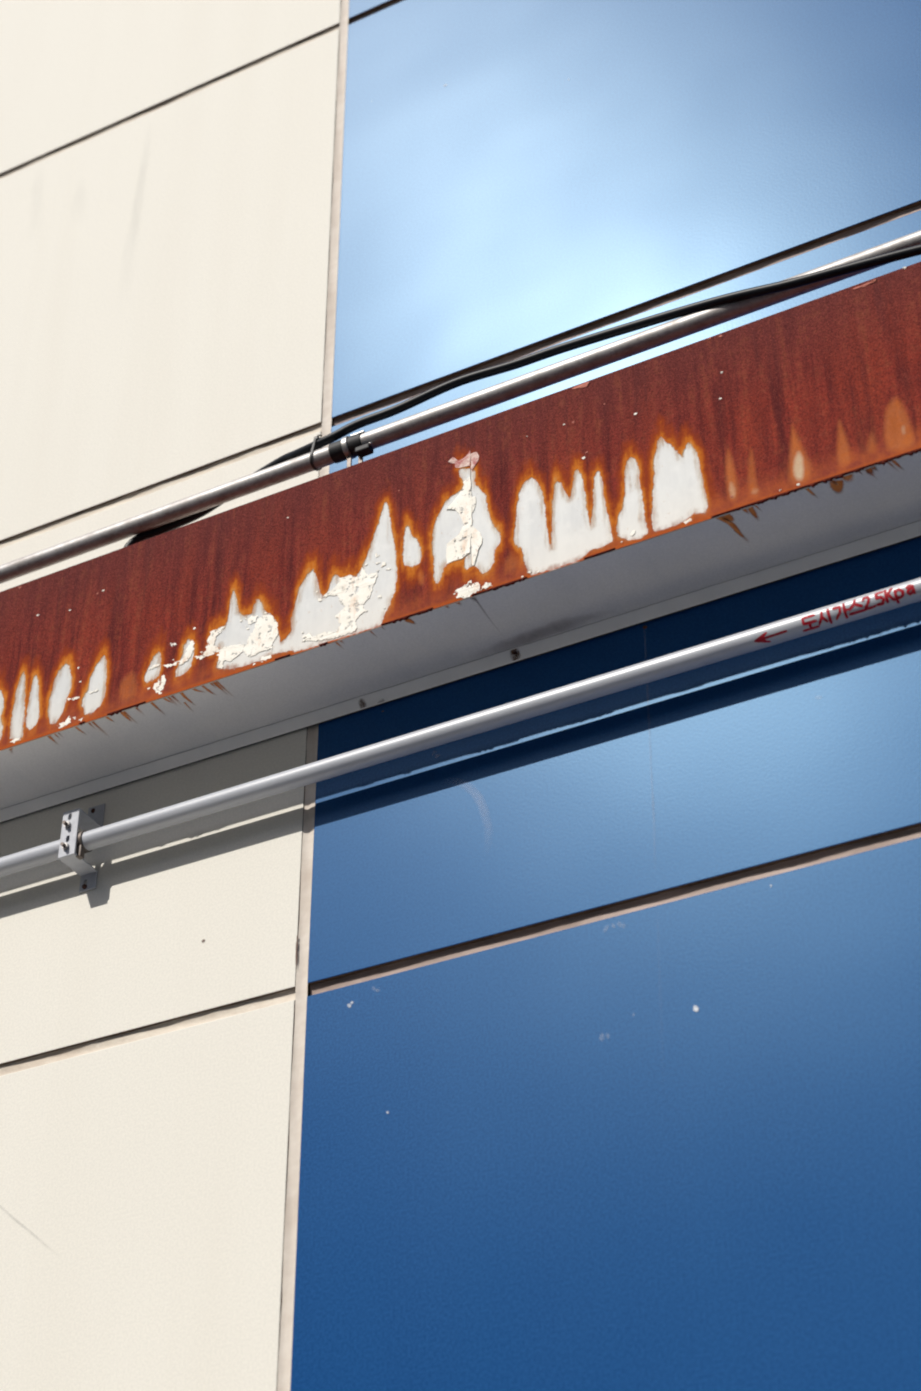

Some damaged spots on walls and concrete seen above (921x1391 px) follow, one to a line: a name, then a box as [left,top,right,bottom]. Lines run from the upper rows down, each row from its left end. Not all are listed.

rust [0,262,921,750]
peeling [446,451,492,599]
peeling [302,553,391,642]
peeling [59,667,99,728]
peeling [147,612,278,694]